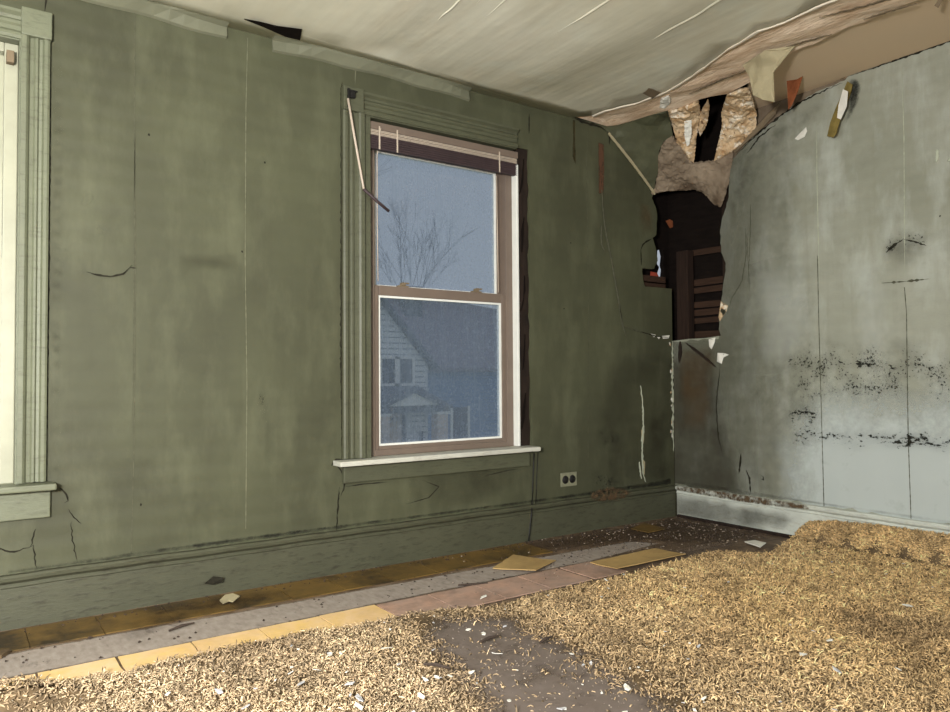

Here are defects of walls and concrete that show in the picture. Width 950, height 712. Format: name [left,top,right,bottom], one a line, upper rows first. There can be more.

crack [88,265,134,277]
flaking render [642,78,846,509]
water stain [788,347,950,523]
crack [0,529,37,567]